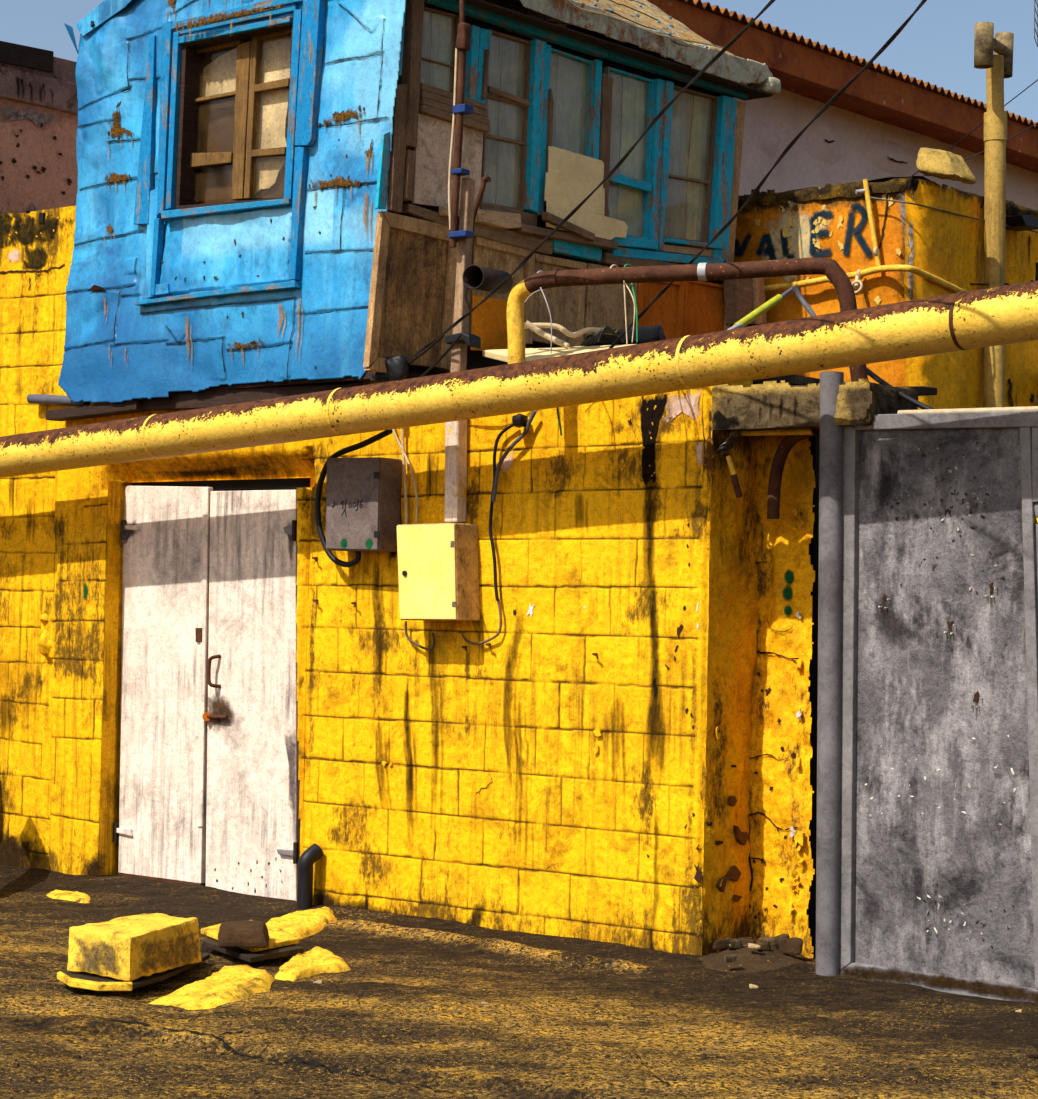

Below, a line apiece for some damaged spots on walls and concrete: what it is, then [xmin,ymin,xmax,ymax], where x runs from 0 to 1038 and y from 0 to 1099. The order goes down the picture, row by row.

rust [164,0,287,34]
rust [107,101,138,154]
rust [323,105,365,133]
rust [309,138,373,238]
leakage [0,205,71,269]
peeling [740,189,858,261]
leakage [640,394,667,780]
leakage [503,628,520,760]
leakage [404,691,413,819]
leakage [313,891,397,914]
leakage [466,904,485,926]
spalling [716,825,806,919]